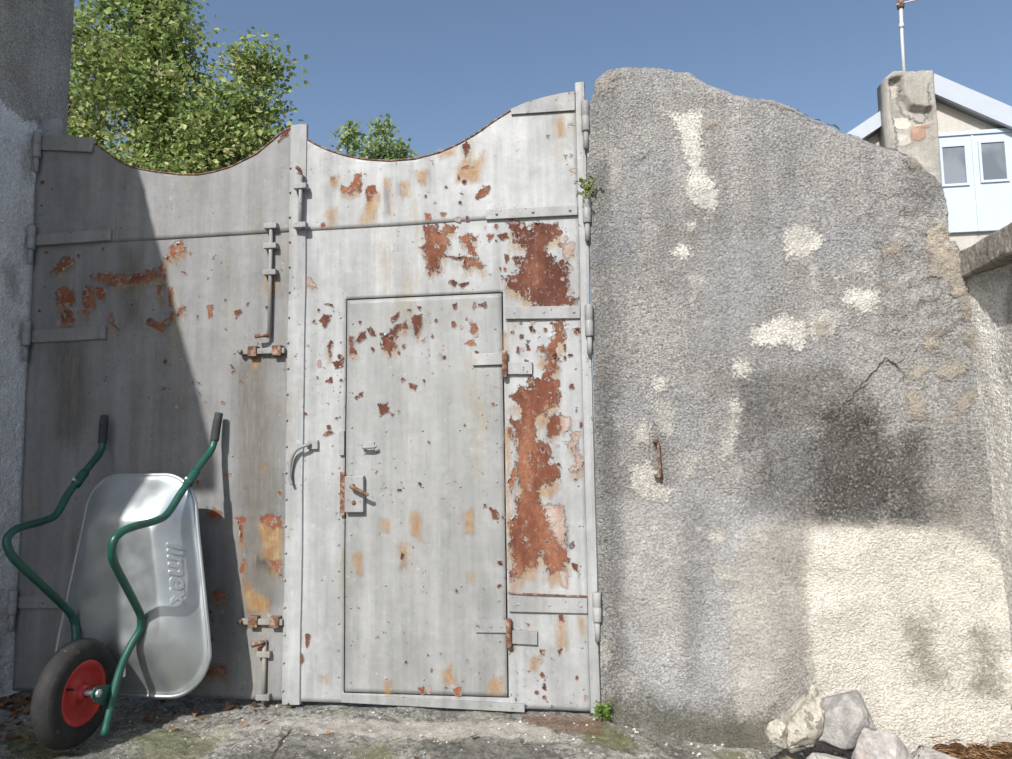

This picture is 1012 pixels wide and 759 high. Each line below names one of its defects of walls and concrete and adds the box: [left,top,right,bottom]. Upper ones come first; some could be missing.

flaking render [892,118,929,146]
rust [50,239,226,331]
rust [319,303,334,328]
rust [325,306,423,383]
rust [464,322,479,346]
rust [418,212,579,307]
crack [843,357,906,409]
rust [483,319,581,583]
leakage [811,407,921,524]
rust [206,505,222,519]
rust [234,515,247,543]
rust [259,513,283,577]